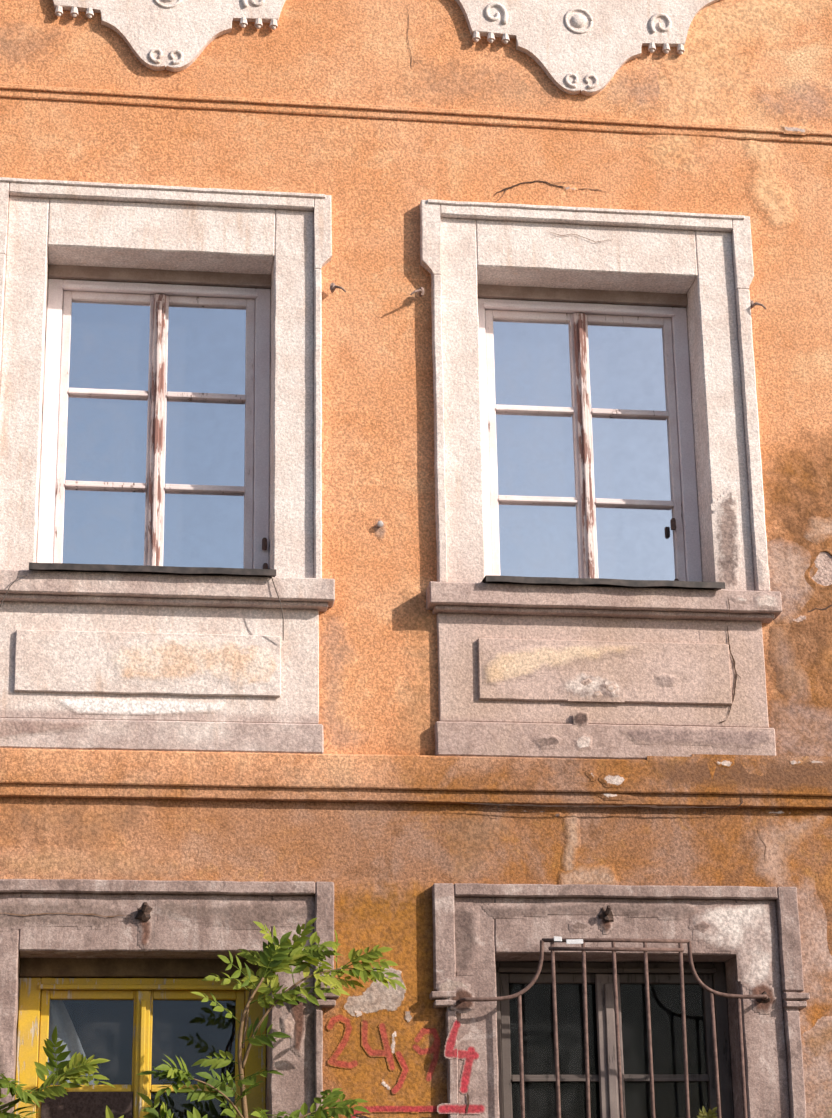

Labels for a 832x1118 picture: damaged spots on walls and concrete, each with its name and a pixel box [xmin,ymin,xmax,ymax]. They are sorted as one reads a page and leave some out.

crack [493,180,606,202]
flaking render [803,516,832,597]
damp [619,422,832,794]
peeling [554,671,625,702]
crack [719,599,741,723]
flaking render [585,770,638,800]
flaking render [342,966,414,1056]
corrosion [449,987,475,1013]
flaking render [689,809,832,1118]
corrosion [750,983,777,1014]